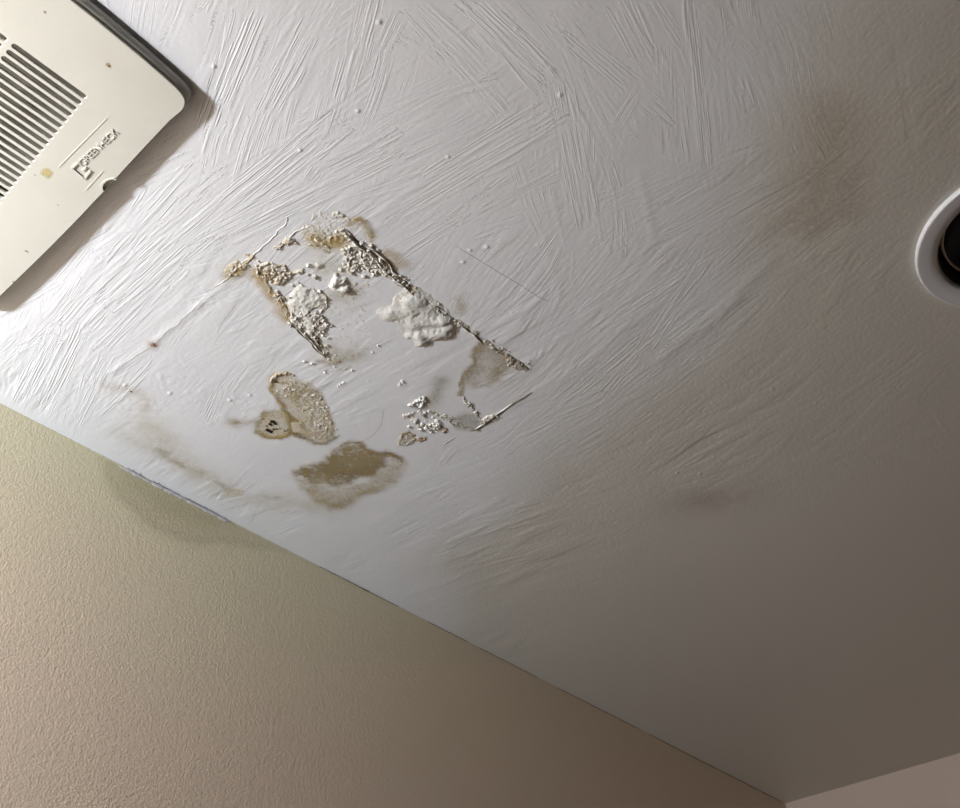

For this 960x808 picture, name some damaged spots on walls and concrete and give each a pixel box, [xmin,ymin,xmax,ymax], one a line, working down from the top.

flaking render [206,210,379,387]
damp [460,339,530,396]
damp [254,410,293,439]
flaking render [268,371,338,444]
peeling [397,382,532,446]
damp [297,442,403,507]